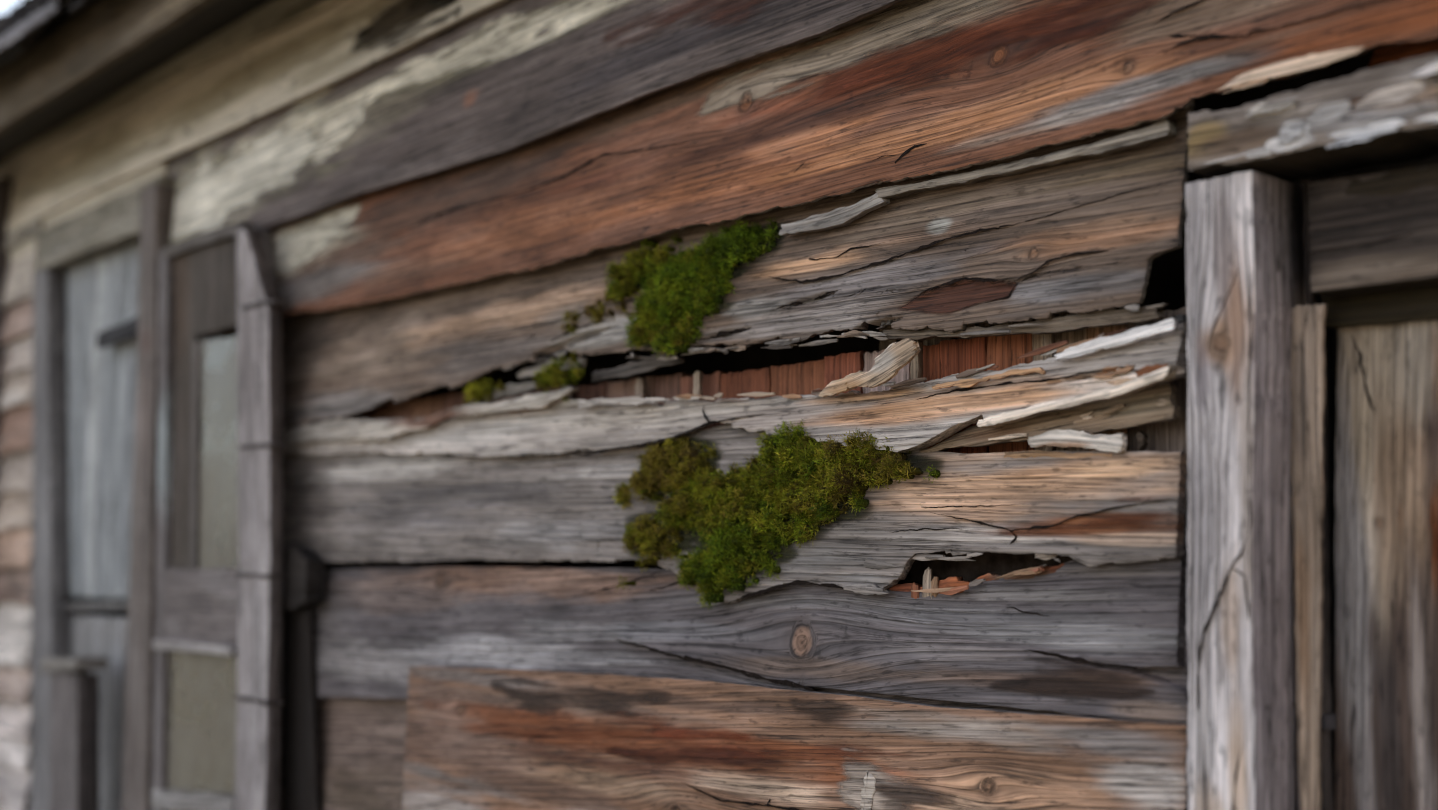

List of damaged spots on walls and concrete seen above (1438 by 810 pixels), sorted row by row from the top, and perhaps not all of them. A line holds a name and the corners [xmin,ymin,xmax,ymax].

peeling [1091,364,1169,385]
crack [1196,269,1252,710]
crack [616,639,813,691]
spalling [839,763,948,810]